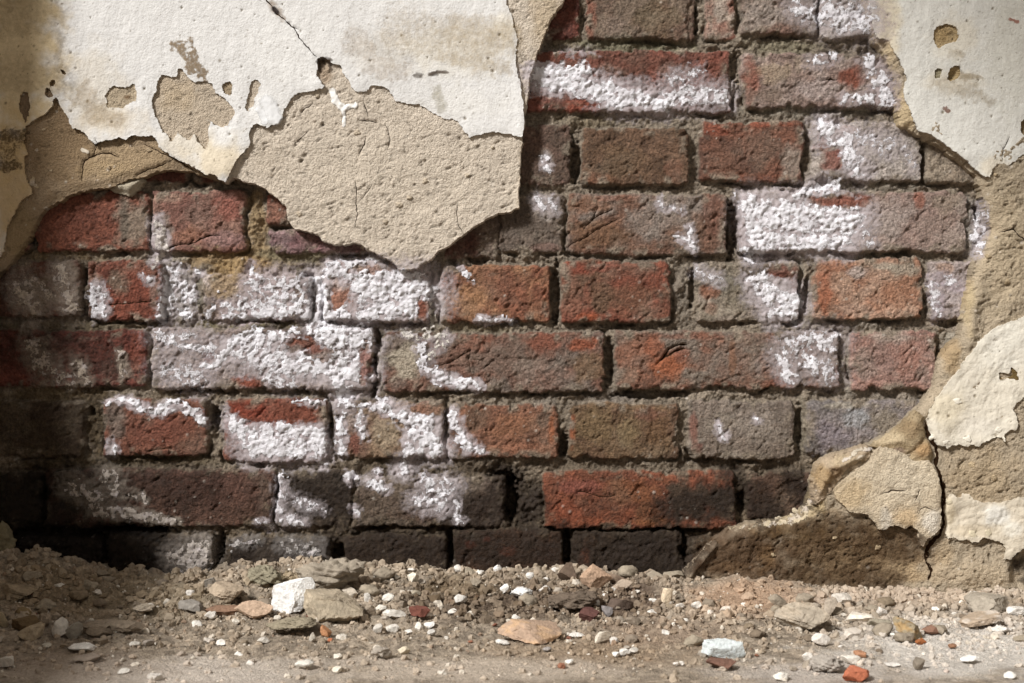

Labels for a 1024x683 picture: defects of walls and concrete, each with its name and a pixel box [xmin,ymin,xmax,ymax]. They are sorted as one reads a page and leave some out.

flaking render [0,0,565,278]
crack [266,0,315,56]
damp [0,215,923,589]
flaking render [696,0,1024,592]
crack [882,422,946,580]